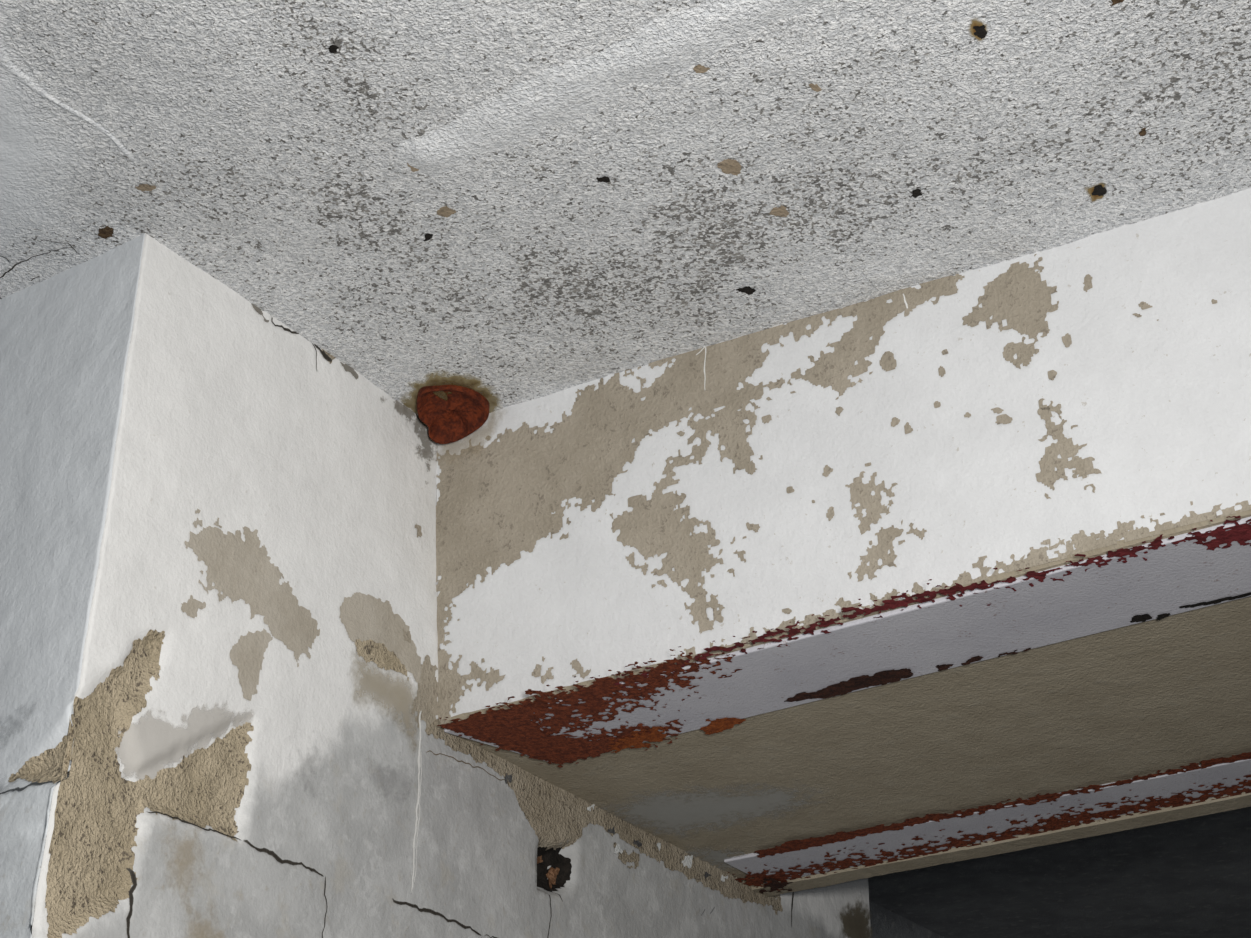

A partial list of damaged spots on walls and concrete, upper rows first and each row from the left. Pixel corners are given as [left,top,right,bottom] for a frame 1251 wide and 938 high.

peeling [437,206,457,217]
peeling [962,254,1072,369]
corrosion [381,373,498,470]
peeling [339,274,1251,915]
spalling [8,508,320,938]
corrosion [438,646,746,768]
corrosion [784,668,913,702]
corrosion [935,656,983,671]
crack [126,868,137,938]
crack [148,811,328,938]
crack [393,899,497,938]
corrosion [726,752,1251,894]